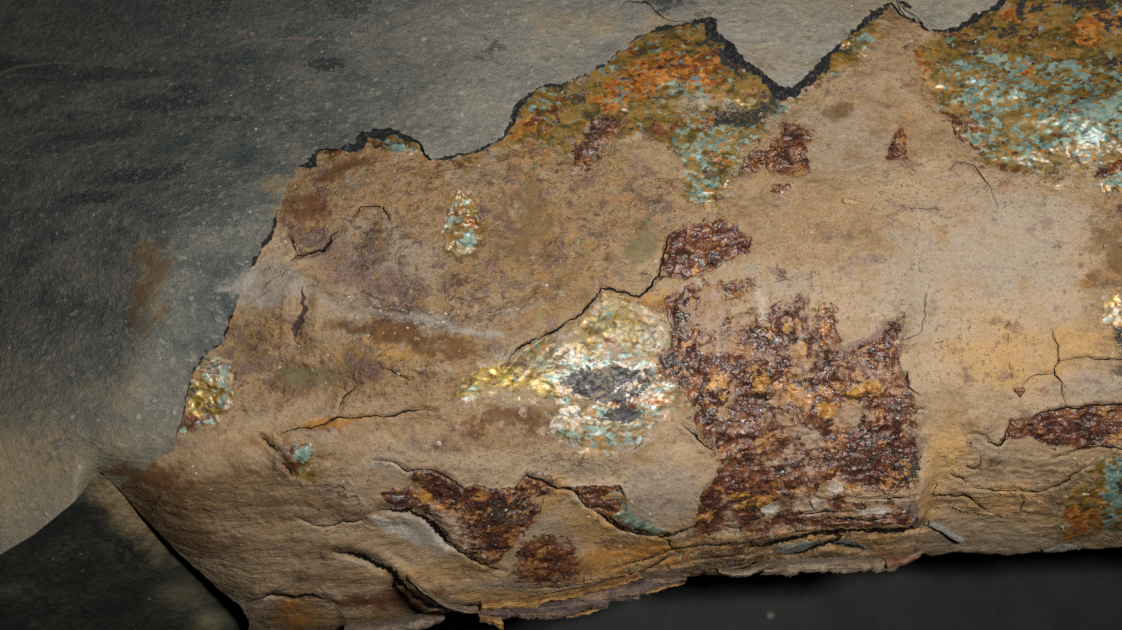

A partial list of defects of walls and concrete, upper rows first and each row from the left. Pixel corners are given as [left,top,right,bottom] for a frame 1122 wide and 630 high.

peeling [300,0,1122,220]
corrosion [739,119,815,195]
corrosion [884,126,908,163]
crack [505,230,678,366]
peeling [176,351,235,440]
crack [260,384,434,476]
peeling [386,287,718,535]
corrosion [344,212,924,630]
corrosion [1001,402,1122,451]
crack [1022,331,1122,415]
crack [515,445,1122,589]
peeling [1048,445,1122,546]